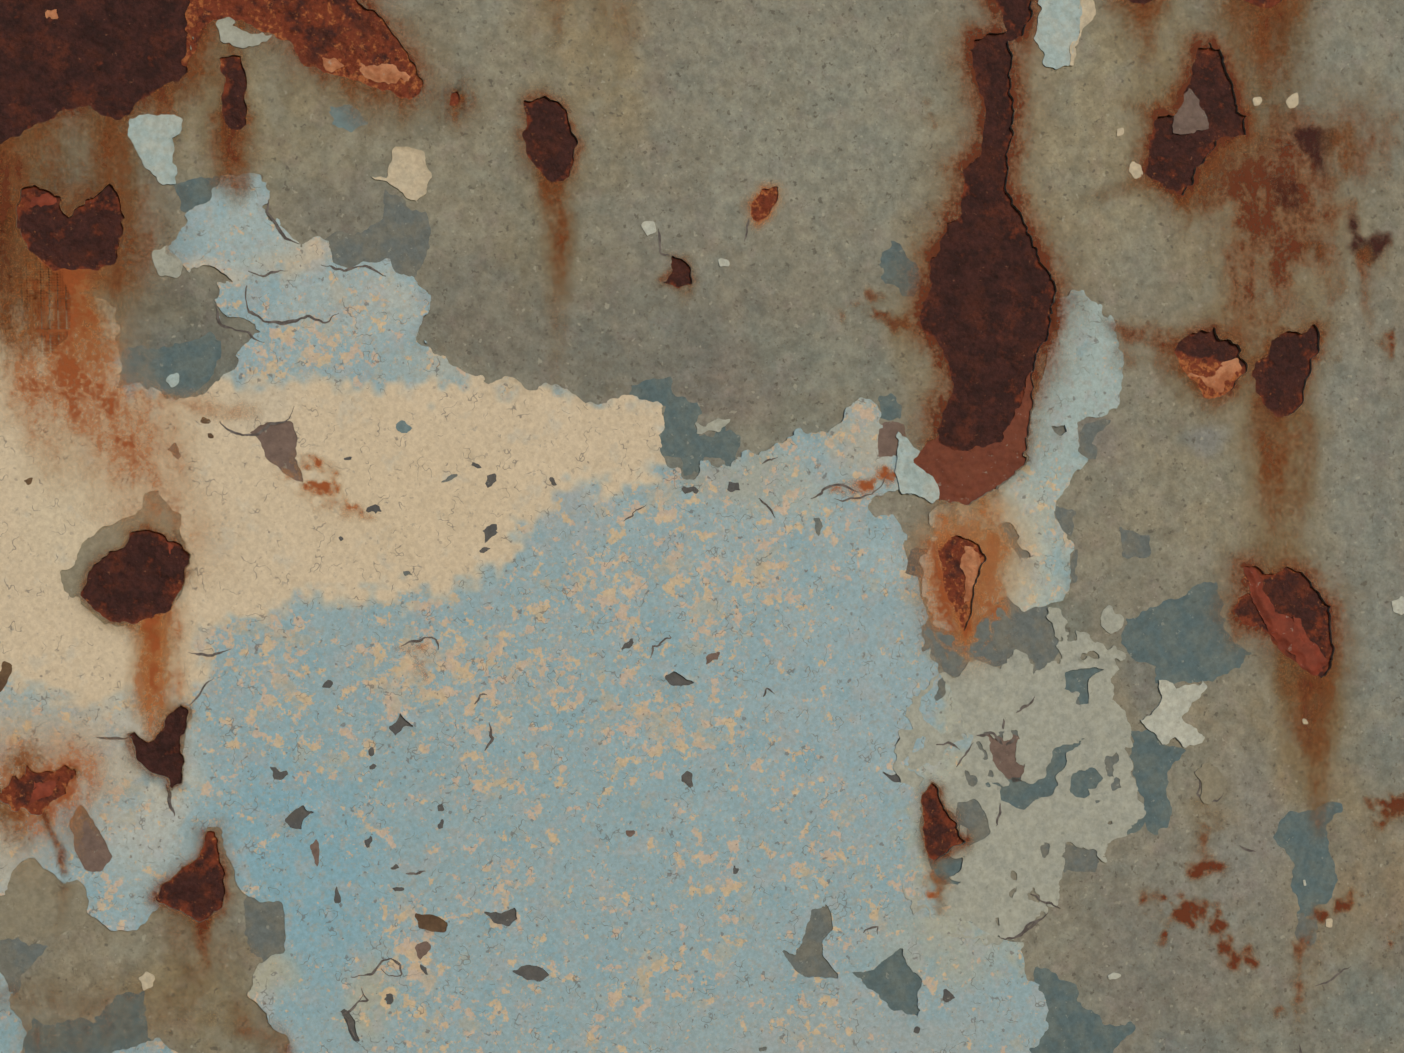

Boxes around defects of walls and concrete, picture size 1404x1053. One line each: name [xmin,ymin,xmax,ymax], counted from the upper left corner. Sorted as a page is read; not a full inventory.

rust [0,0,426,487]
peeling [329,105,368,132]
rust [517,93,583,277]
rust [865,0,1070,650]
rust [1113,33,1391,499]
rust [80,525,190,788]
peeling [0,114,1251,1053]
rust [1228,556,1343,765]
rust [0,743,97,870]
rust [151,831,229,954]
rust [921,783,970,898]
rust [1140,894,1259,969]